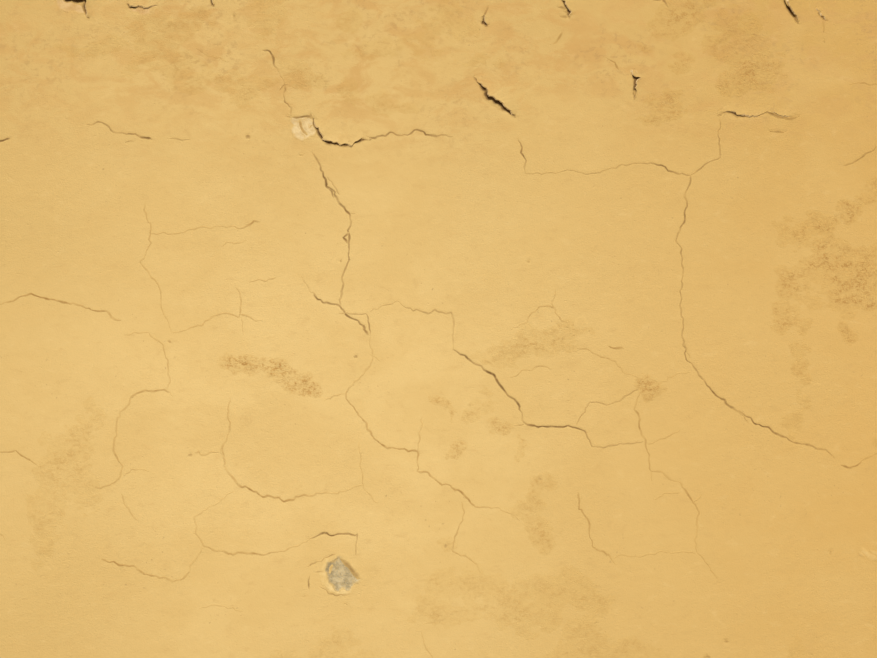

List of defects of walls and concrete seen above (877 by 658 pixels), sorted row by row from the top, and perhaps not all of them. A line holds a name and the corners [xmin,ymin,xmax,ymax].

peeling [56,0,99,19]
peeling [781,0,804,24]
peeling [472,73,525,118]
peeling [287,113,372,147]
crack [0,202,276,521]
crack [86,119,877,605]
spalling [319,554,360,597]